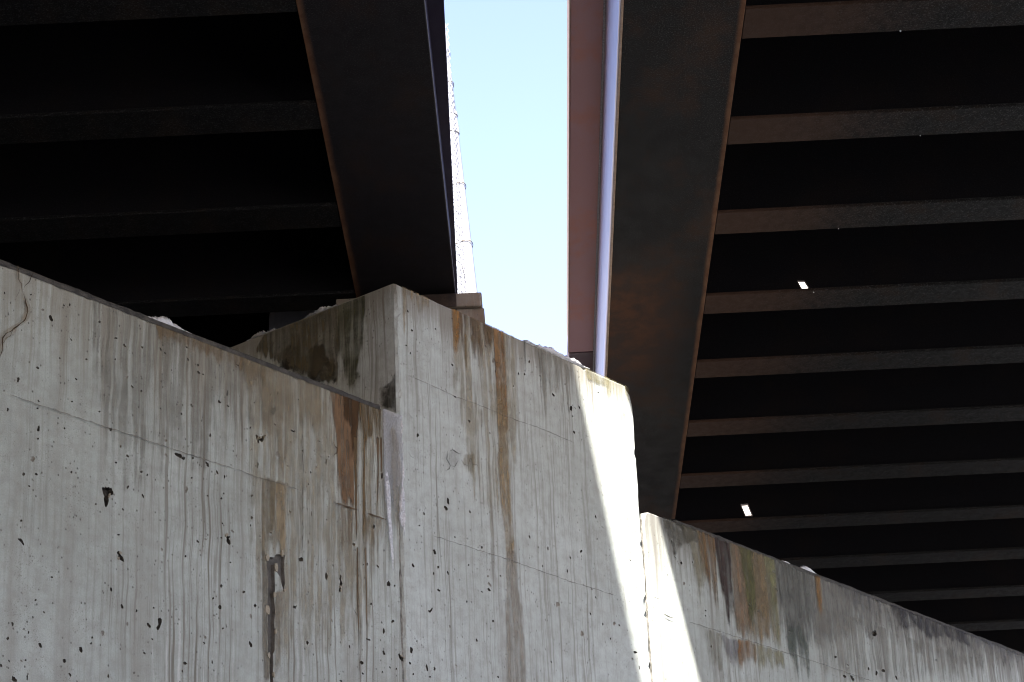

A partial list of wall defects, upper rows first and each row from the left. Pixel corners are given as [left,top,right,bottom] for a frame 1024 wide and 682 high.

crack [0,270,34,356]
corrosion [453,309,511,522]
damp [240,306,362,679]
corrosion [330,391,382,631]
peeling [265,550,286,682]
corrosion [506,538,525,682]
damp [755,560,1022,665]